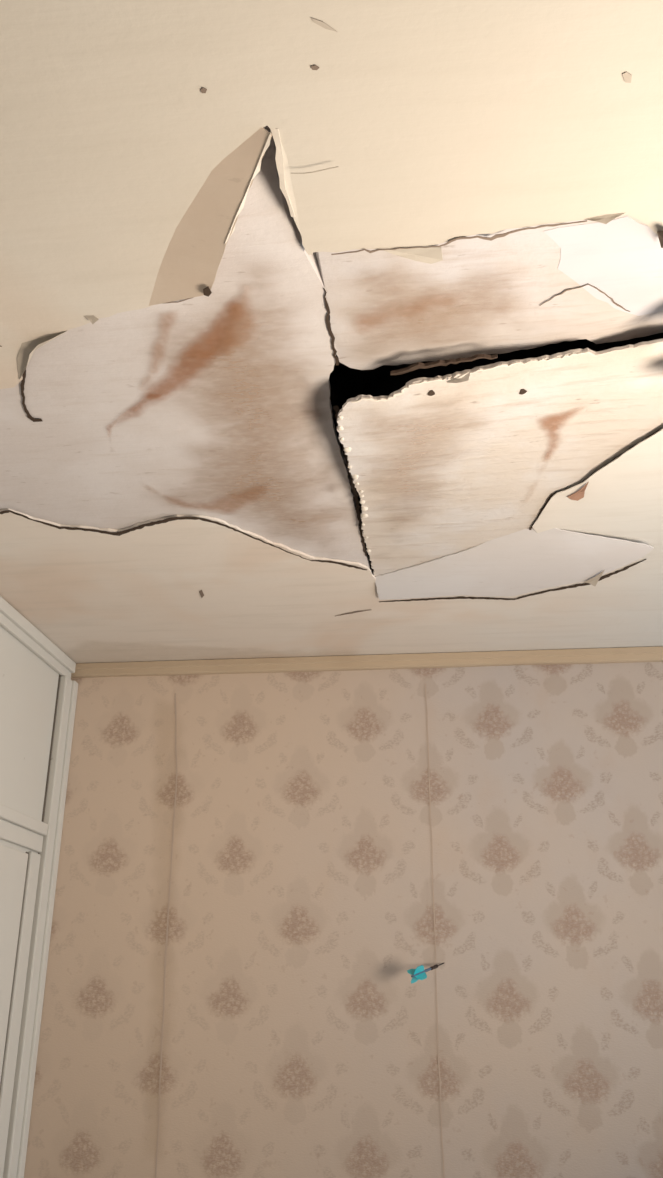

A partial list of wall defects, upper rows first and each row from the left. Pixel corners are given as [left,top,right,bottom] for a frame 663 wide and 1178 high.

flaking render [0,126,663,569]
crack [0,284,663,570]
crack [331,220,587,255]